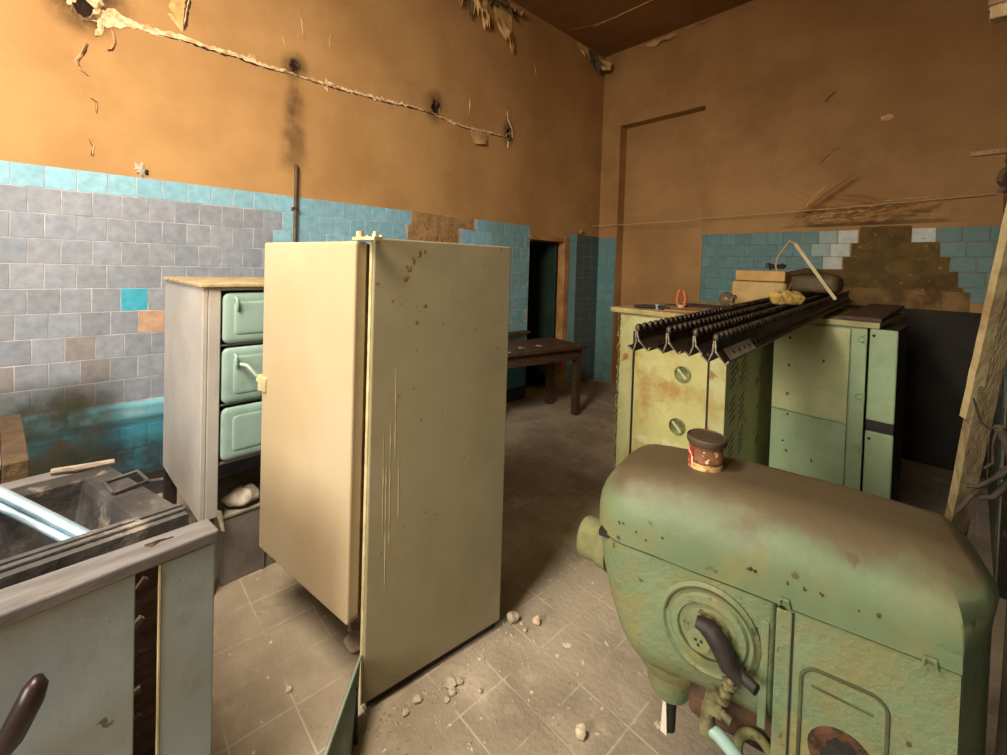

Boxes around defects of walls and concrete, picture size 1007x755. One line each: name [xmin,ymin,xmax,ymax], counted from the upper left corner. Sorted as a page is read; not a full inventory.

flaking render [66,0,140,76]
crack [96,0,506,146]
peeling [459,0,527,53]
peeling [577,42,611,74]
peeling [408,211,474,243]
peeling [816,225,970,312]